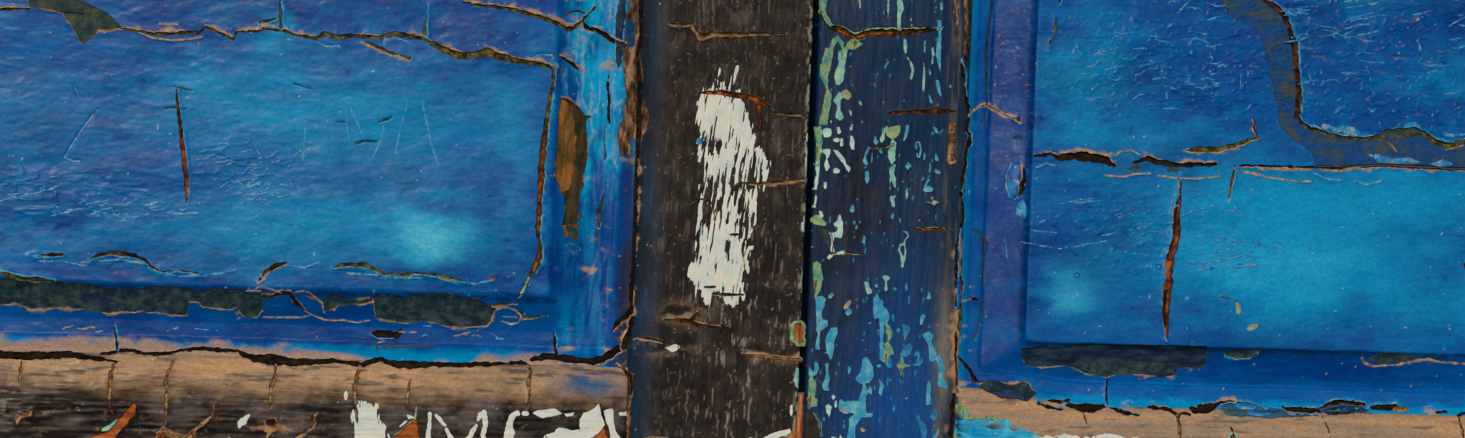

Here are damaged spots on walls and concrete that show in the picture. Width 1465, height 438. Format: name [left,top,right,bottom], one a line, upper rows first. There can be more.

peeling [28,0,131,45]
peeling [0,276,547,352]
crack [0,0,627,298]
crack [0,158,808,438]
peeling [554,0,651,252]
crack [669,23,781,39]
crack [701,89,806,129]
peeling [794,0,1138,438]
peeling [975,296,1262,401]
crack [818,0,1465,438]
peeling [1220,400,1369,419]
peeling [1221,0,1465,170]